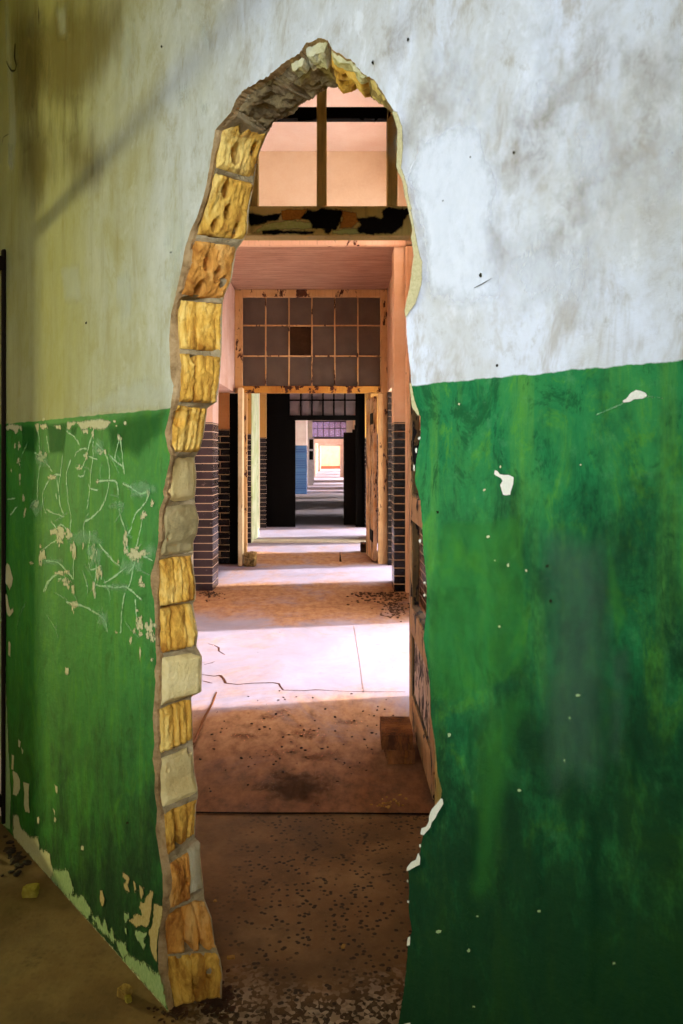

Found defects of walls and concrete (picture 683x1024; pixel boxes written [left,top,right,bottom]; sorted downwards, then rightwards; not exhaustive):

spalling [248,111,422,317]
spalling [409,383,419,415]
peeling [623,390,647,402]
peeling [6,423,22,479]
peeling [35,417,126,470]
peeling [494,465,514,495]
peeling [50,526,102,614]
peeling [117,531,150,565]
crack [202,644,363,692]
peeling [0,563,168,1011]
spalling [406,798,443,882]